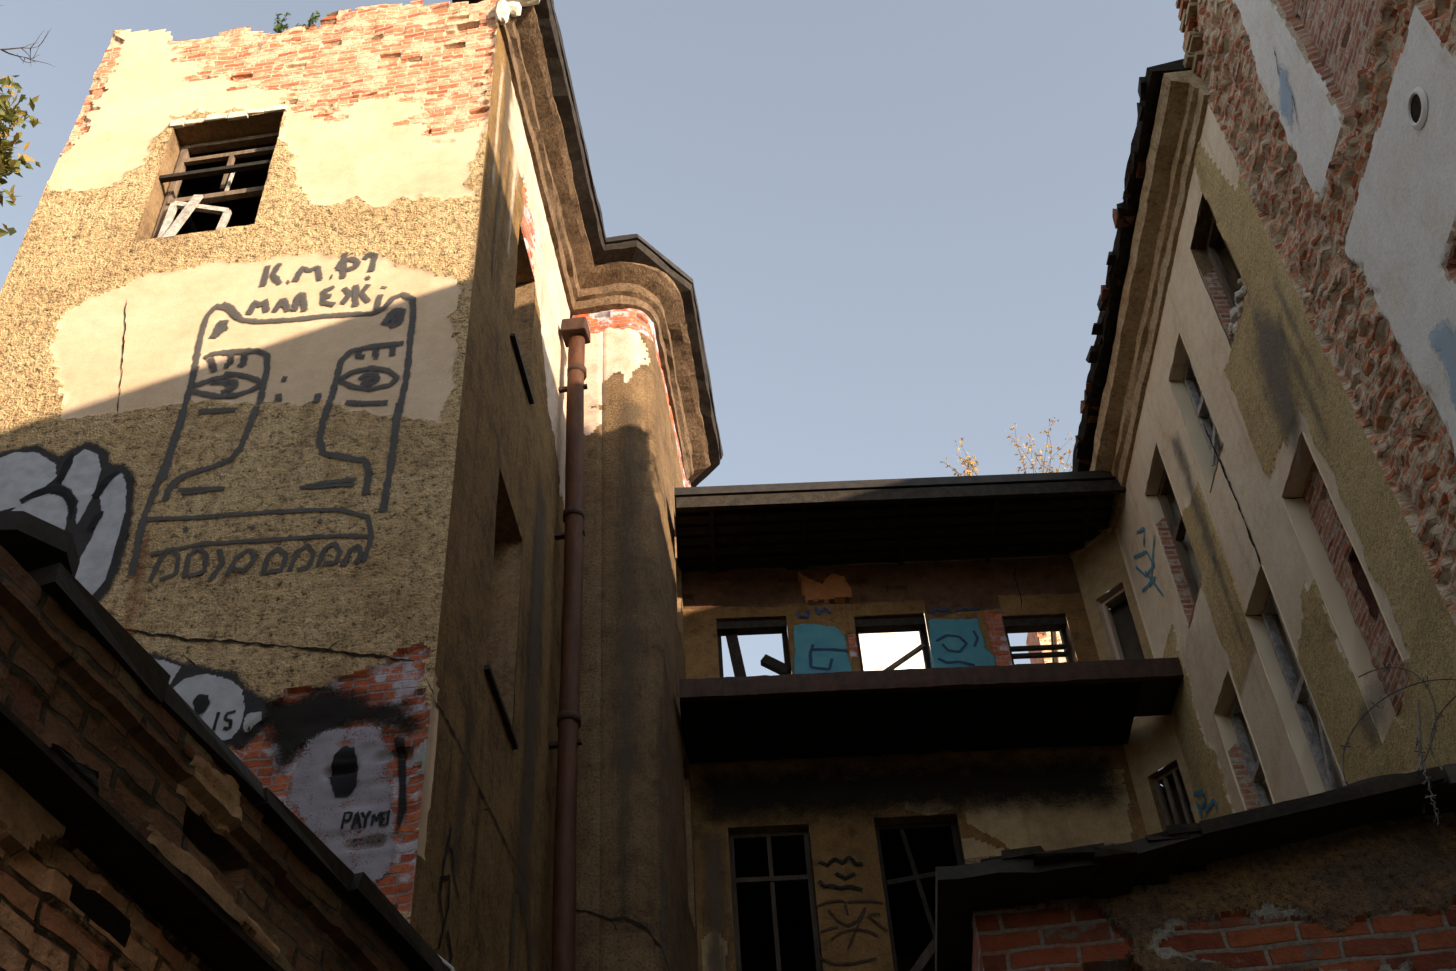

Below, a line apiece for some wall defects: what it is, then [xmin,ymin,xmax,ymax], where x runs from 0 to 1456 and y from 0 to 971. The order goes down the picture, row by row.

flaking render [49,0,500,207]
flaking render [49,251,461,423]
flaking render [508,83,691,509]
spalling [1115,0,1456,813]
crack [128,629,532,894]
spalling [232,643,440,915]
crack [576,909,670,971]